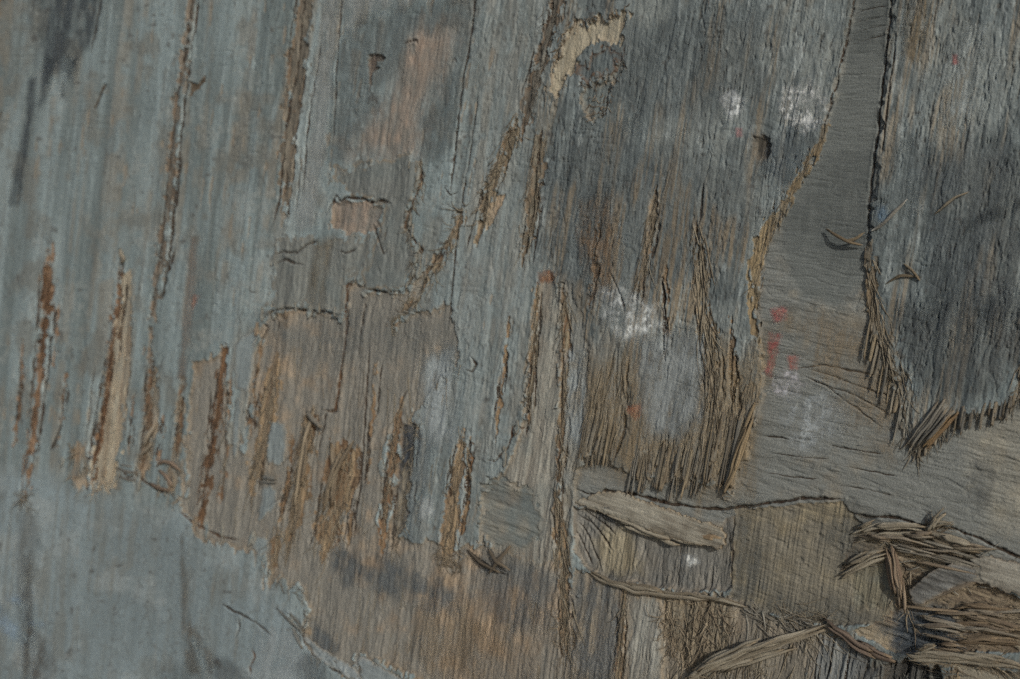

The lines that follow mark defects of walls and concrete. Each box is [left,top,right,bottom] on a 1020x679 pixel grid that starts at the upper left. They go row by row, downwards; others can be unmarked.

spalling [545,3,633,123]
spalling [753,136,772,161]
crack [15,0,293,580]
crack [254,0,504,547]
peeling [64,269,162,503]
crack [446,218,1020,656]
peeling [713,627,882,679]
spalling [883,658,1020,679]
spalling [887,608,1020,654]